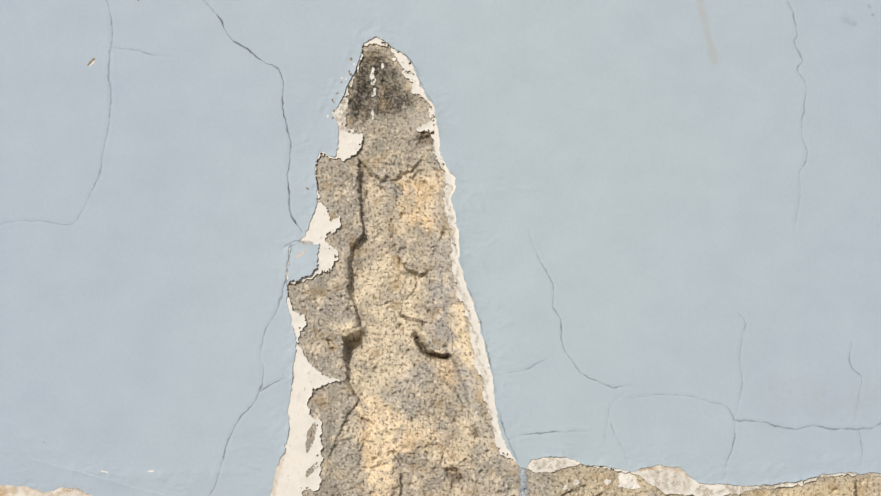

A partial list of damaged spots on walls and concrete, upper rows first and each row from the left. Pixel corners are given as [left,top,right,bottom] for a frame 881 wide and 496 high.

peeling [0,485,93,496]
spalling [270,37,881,496]